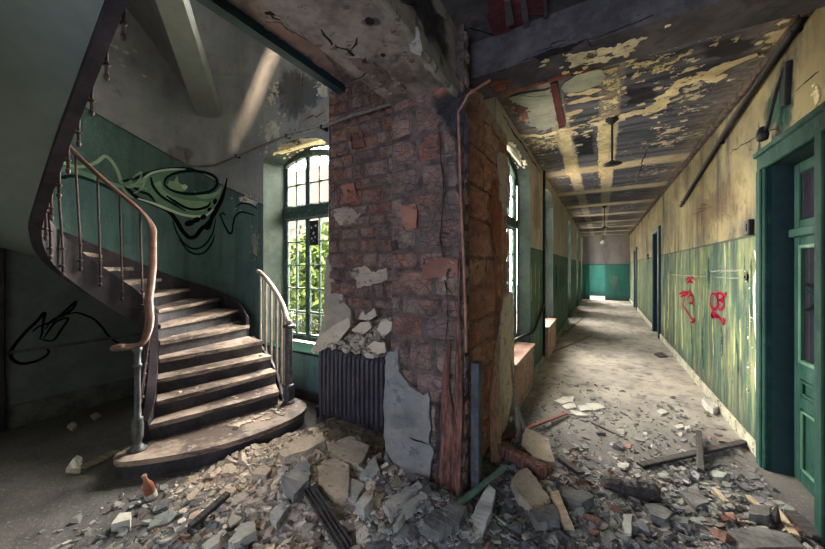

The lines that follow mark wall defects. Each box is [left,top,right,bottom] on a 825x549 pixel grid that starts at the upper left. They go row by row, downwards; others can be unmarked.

crack [320,29,366,80]
flaking render [258,17,792,493]